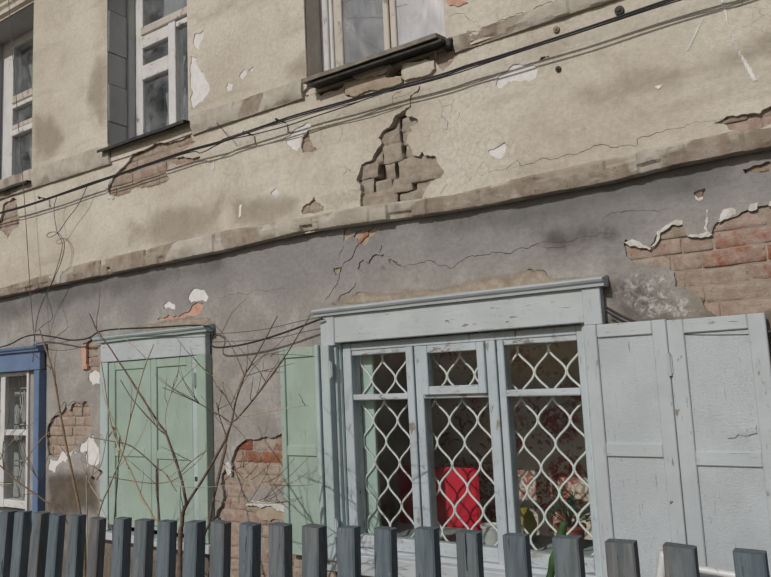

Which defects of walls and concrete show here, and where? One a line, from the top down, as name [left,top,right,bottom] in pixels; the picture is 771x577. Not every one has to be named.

peeling [190,32,210,109]
peeling [497,57,546,88]
peeling [285,123,317,152]
flaking render [716,108,771,131]
flaking render [105,136,200,200]
flaking render [0,198,19,236]
crack [379,232,613,269]
flaking render [621,201,771,317]
peeling [158,288,208,321]
flaking render [48,402,100,473]
flaking render [218,434,284,577]
flaking render [292,554,302,577]